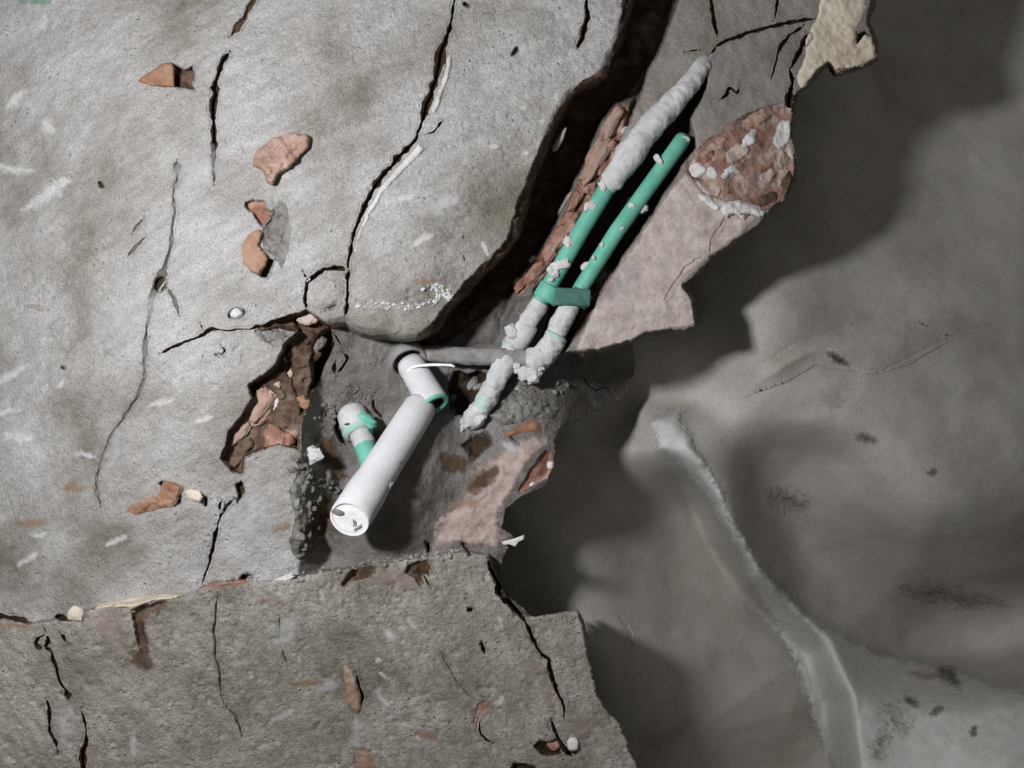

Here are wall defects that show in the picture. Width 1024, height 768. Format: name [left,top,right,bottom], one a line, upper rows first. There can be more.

crack [92,0,458,508]
spalling [253,133,311,185]
spalling [412,0,672,346]
crack [574,0,593,50]
flaking render [577,103,795,351]
crack [685,0,816,119]
flaking render [797,0,876,88]
spalling [220,309,339,563]
flaking render [405,394,560,588]
crack [0,611,91,768]
crack [200,497,244,736]
crack [485,558,574,757]